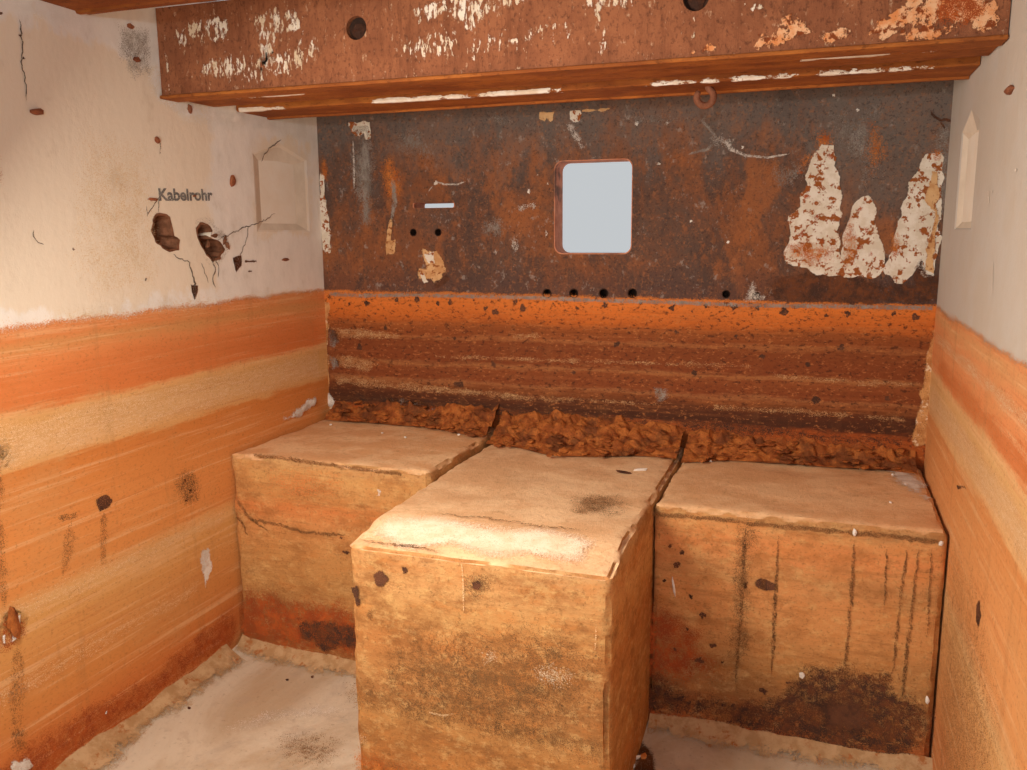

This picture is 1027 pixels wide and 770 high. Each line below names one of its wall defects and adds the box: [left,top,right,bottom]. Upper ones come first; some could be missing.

corrosion [754,13,851,50]
corrosion [868,0,1000,41]
water stain [350,139,377,232]
water stain [932,124,950,213]
peeling [784,127,944,291]
spalling [151,213,180,252]
spalling [196,220,230,265]
crack [174,215,272,300]
corrosion [386,218,396,254]
corrosion [764,269,938,313]
crack [236,498,345,536]
water stain [0,281,1027,770]